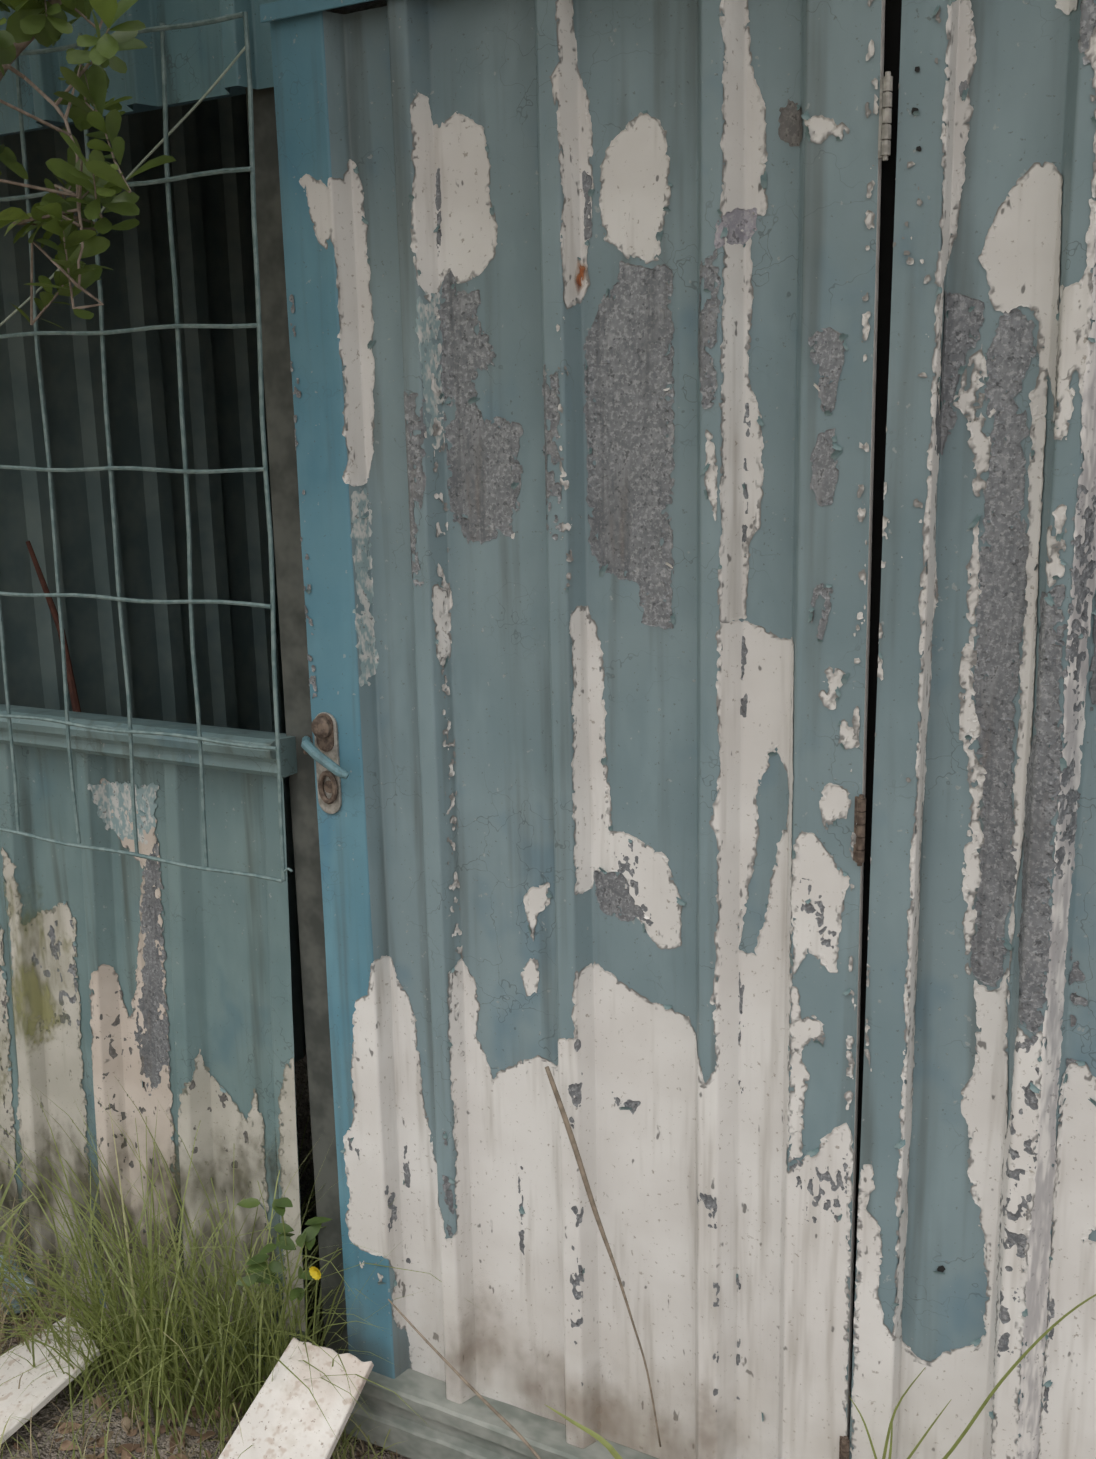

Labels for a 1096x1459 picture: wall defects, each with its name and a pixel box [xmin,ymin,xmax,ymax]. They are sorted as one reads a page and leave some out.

peeling [299,159,379,687]
peeling [340,0,1096,1459]
peeling [0,778,306,1333]